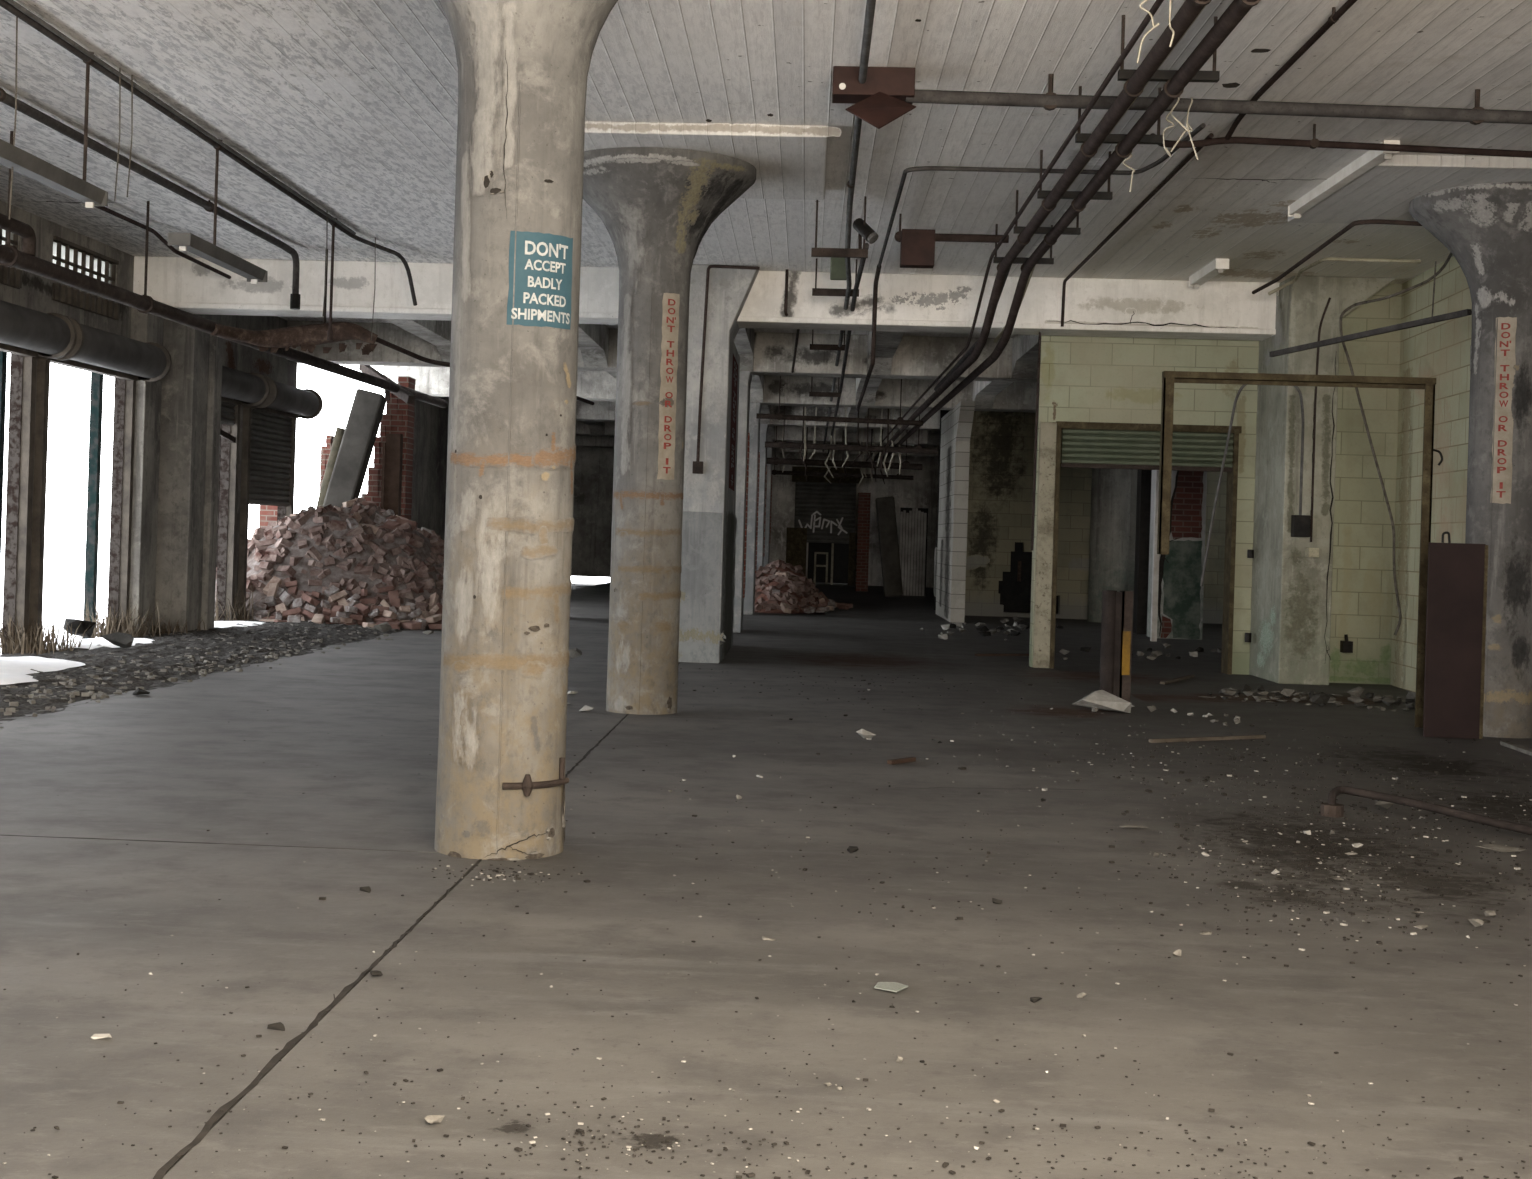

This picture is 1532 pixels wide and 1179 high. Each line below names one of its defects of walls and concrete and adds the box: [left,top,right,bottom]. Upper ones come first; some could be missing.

peeling [583,153,748,476]
peeling [683,422,722,507]
peeling [1161,471,1204,640]
leakage [1286,394,1308,569]
peeling [1414,182,1532,375]
leakage [1511,353,1532,440]
peeling [611,632,633,712]